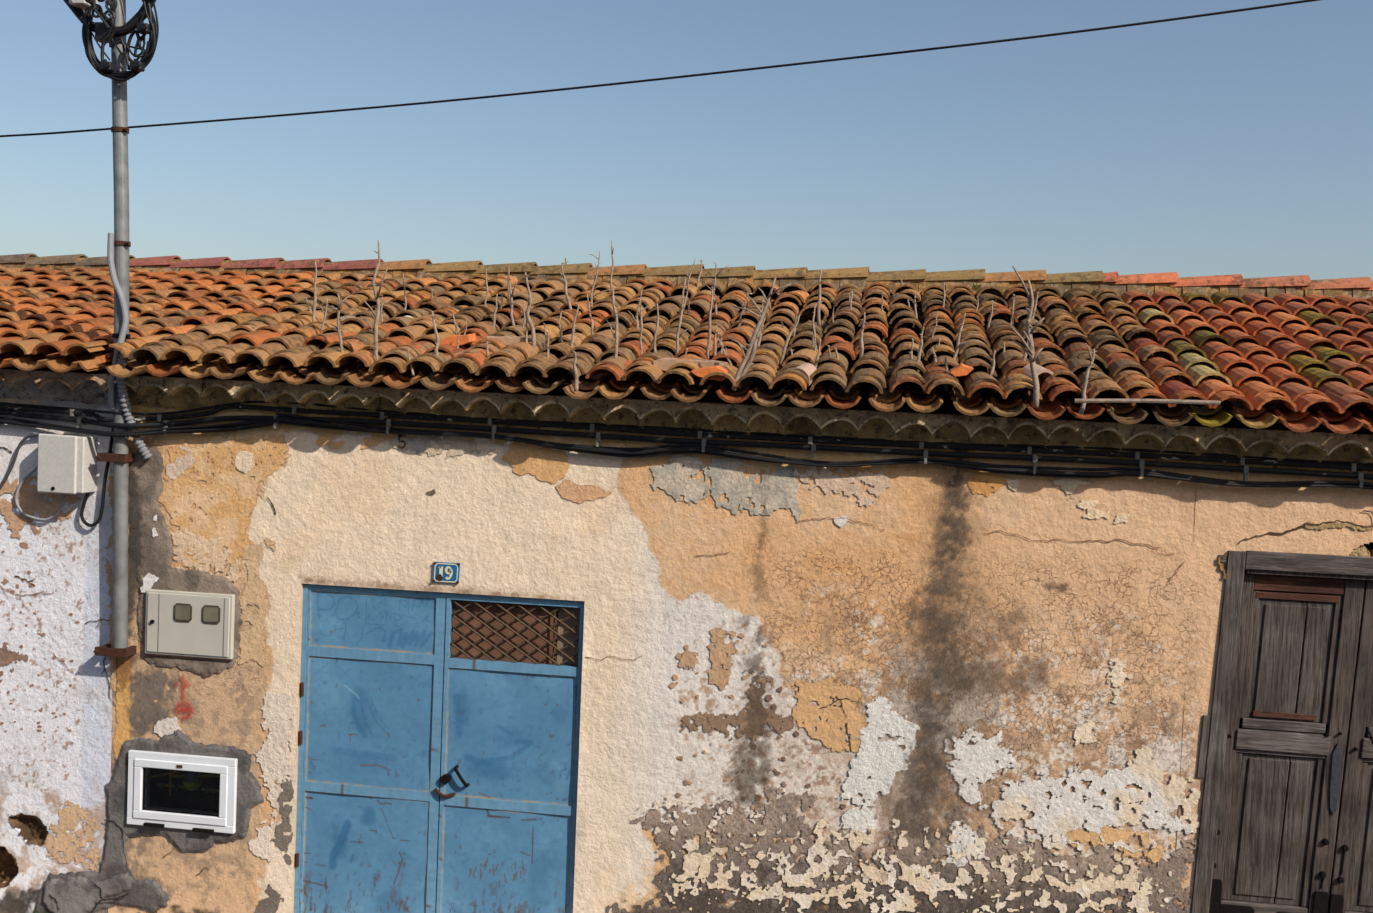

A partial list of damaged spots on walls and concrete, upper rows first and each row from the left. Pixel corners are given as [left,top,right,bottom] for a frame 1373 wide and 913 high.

peeling [0,476,81,553]
peeling [650,451,891,528]
crack [1238,510,1373,545]
flaking render [1349,542,1373,557]
peeling [0,611,72,733]
water stain [606,449,1198,913]
peeling [643,628,1203,913]
flaking render [0,846,19,888]
peeling [8,800,101,871]